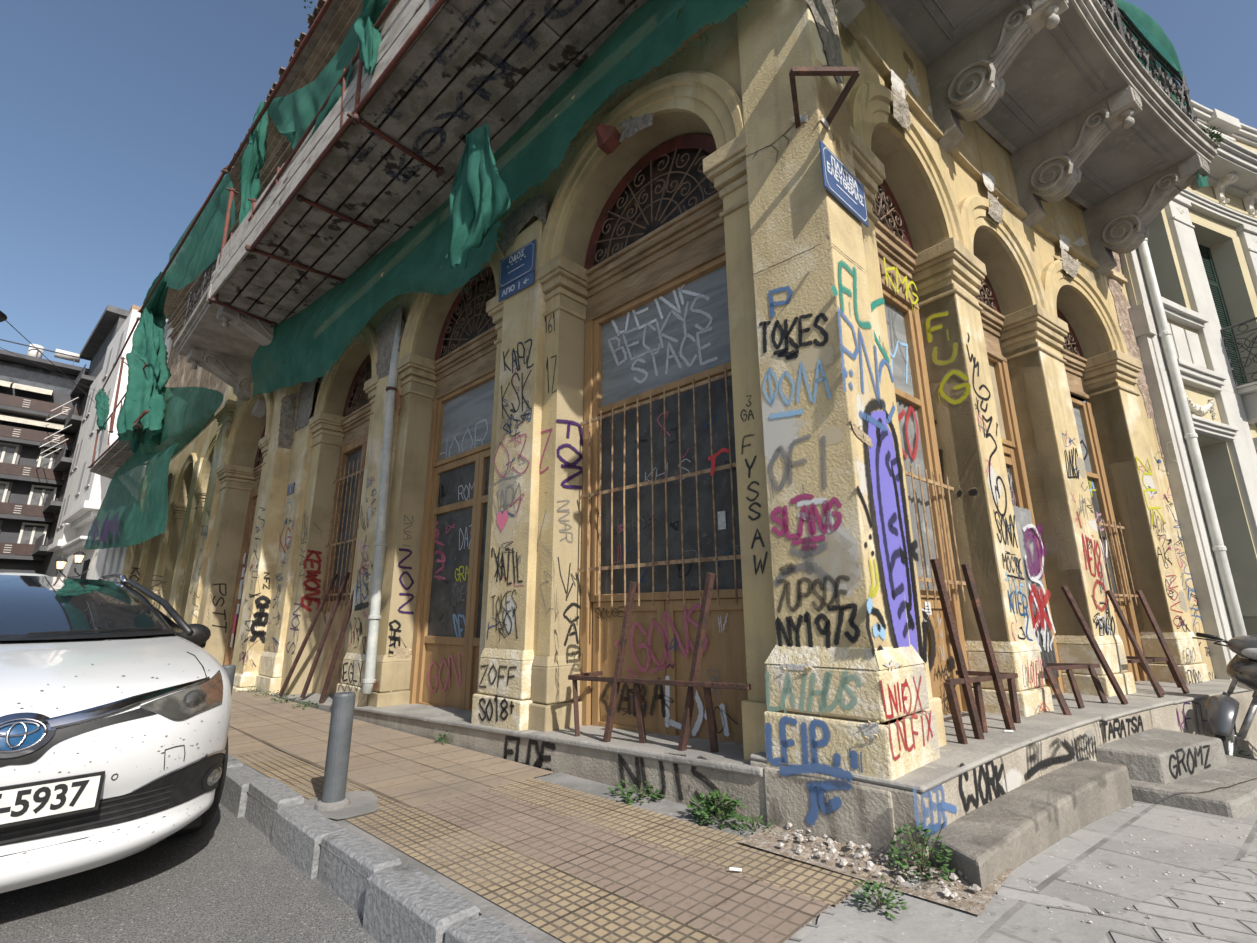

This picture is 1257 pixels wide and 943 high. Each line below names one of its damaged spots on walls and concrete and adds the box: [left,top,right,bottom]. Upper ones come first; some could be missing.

spalling [805,0,847,82]
spalling [891,69,932,132]